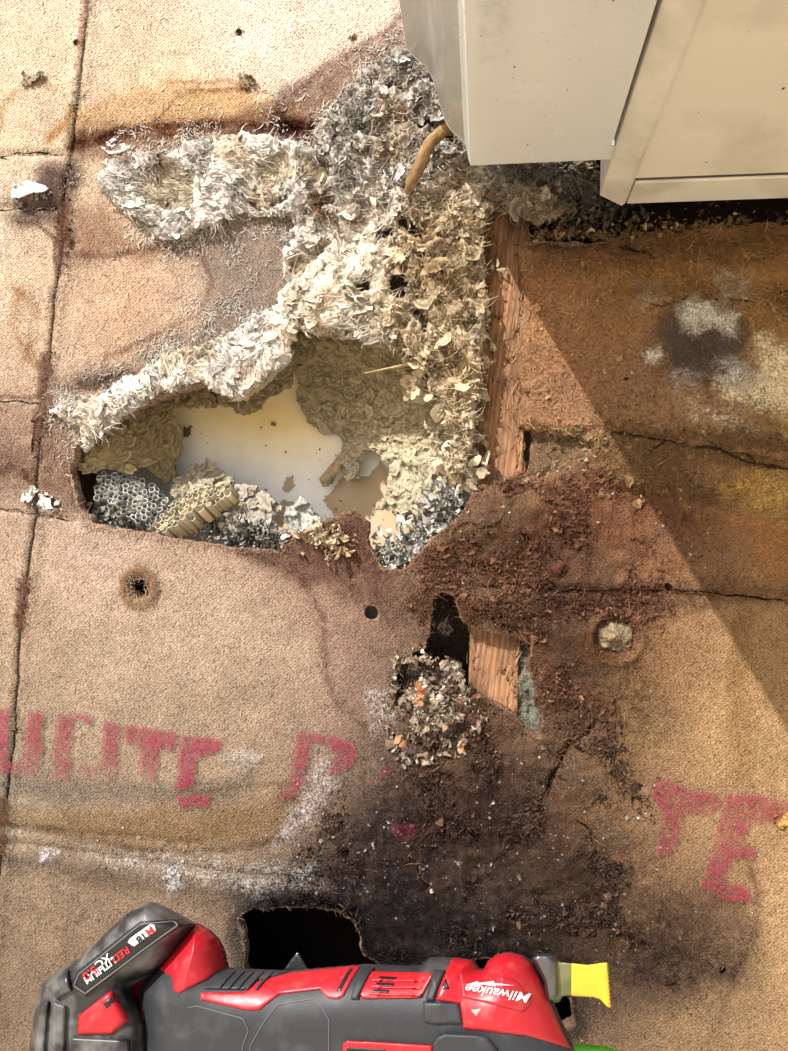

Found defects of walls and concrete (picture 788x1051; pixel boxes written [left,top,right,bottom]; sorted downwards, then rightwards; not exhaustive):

peeling [237,72,256,90]
leakage [642,273,788,437]
peeling [271,461,433,569]
leakage [400,458,788,839]
leakage [233,694,655,966]